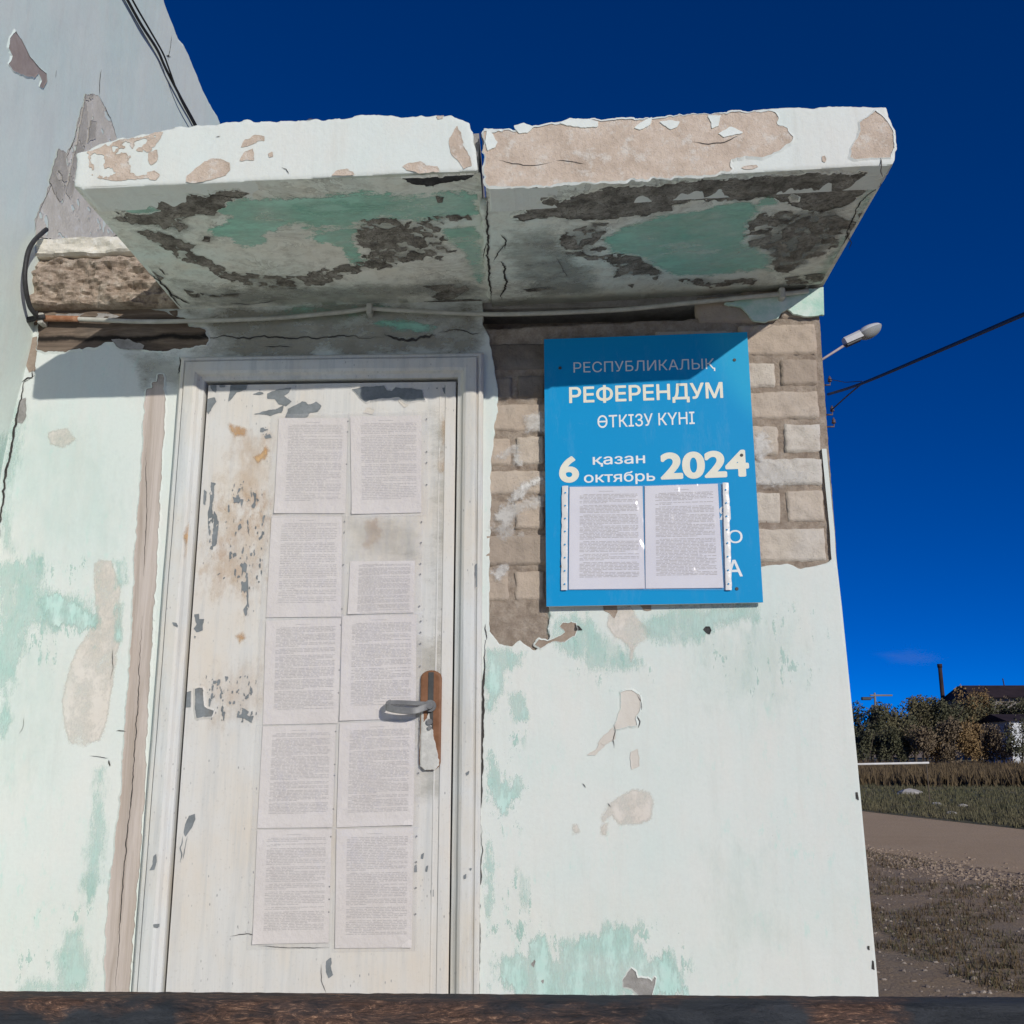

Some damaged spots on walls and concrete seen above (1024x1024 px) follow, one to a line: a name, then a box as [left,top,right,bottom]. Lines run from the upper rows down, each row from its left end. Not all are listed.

peeling [6,29,47,90]
peeling [49,94,163,201]
crack [483,192,508,298]
peeling [111,109,897,298]
crack [0,369,35,522]
peeling [207,385,321,439]
peeling [203,480,265,616]
peeling [18,561,121,744]
peeling [194,614,204,637]
peeling [186,675,257,723]
peeling [588,688,643,755]
peeling [486,843,689,995]